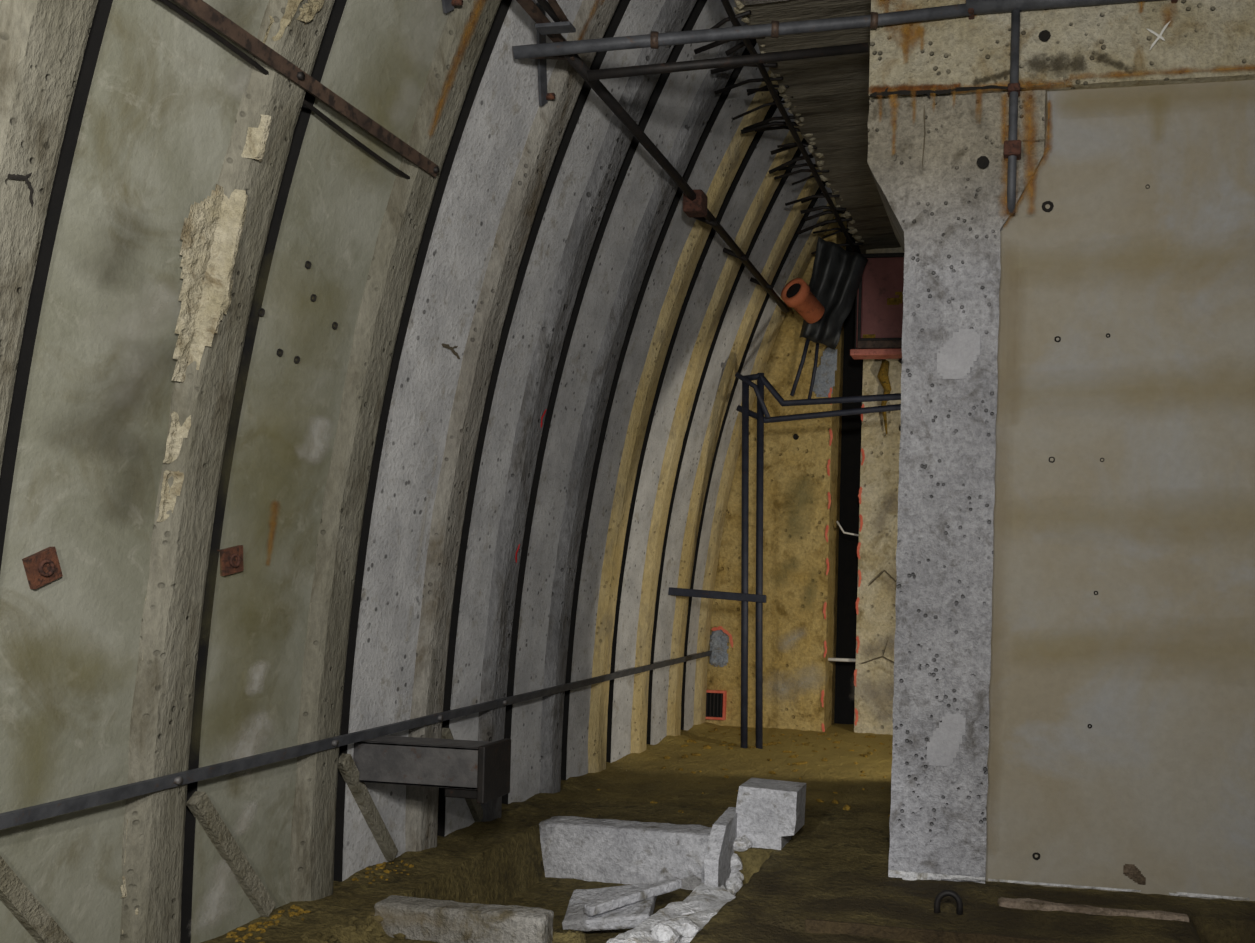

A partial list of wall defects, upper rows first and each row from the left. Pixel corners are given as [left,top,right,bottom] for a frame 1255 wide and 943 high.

peeling [241,114,272,162]
rust [869,83,961,154]
rust [977,76,1085,225]
peeling [172,184,248,383]
peeling [156,412,191,522]
crack [868,570,897,586]
crack [861,640,894,664]